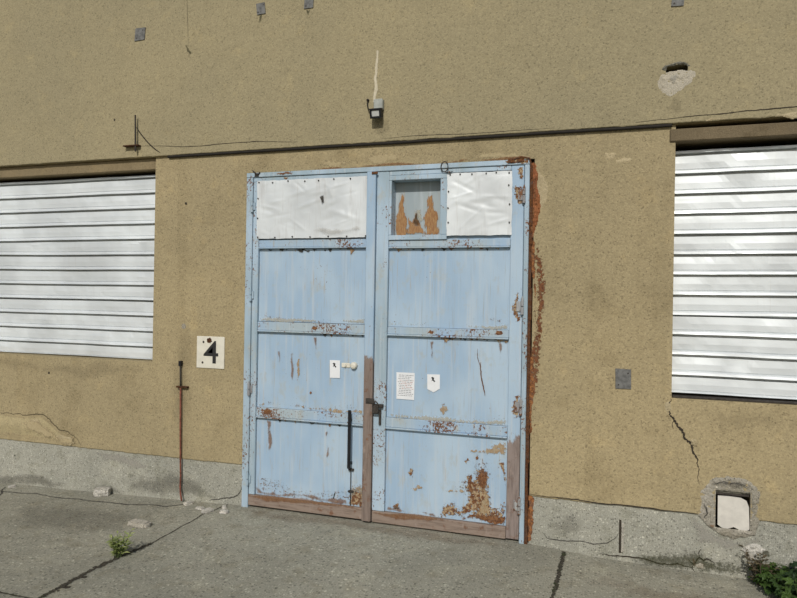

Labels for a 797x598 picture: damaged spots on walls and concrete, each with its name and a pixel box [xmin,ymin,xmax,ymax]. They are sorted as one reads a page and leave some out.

spalling [658,61,696,96]
rust [512,239,546,433]
crack [664,399,699,481]
rust [254,478,362,508]
rust [379,443,506,524]
spalling [698,476,769,561]